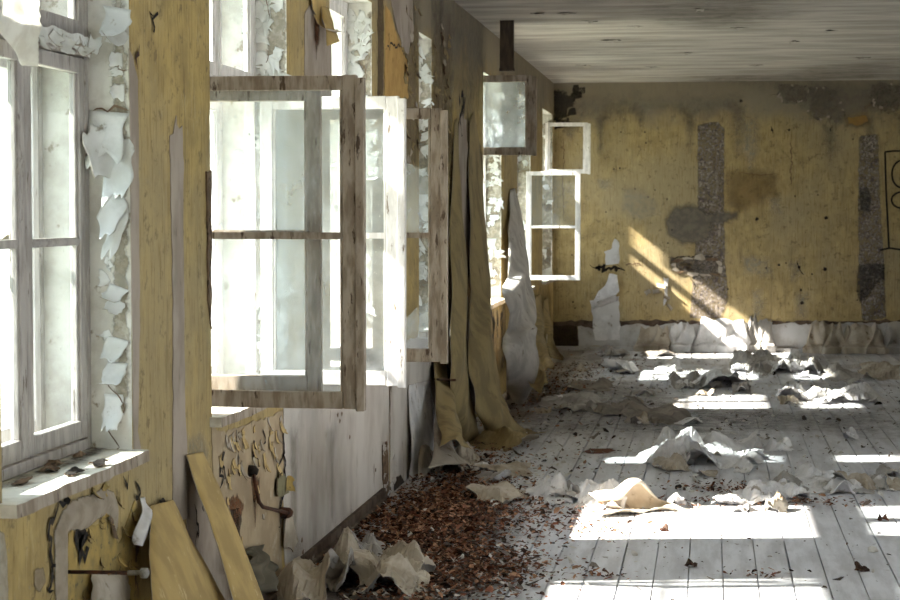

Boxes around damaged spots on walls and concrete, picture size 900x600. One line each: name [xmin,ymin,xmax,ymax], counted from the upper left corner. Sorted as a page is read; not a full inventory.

peeling [255,0,291,76]
peeling [304,5,374,96]
peeling [38,0,141,450]
peeling [273,109,289,230]
peeling [366,239,376,331]
peeling [366,120,382,228]
crack [589,261,643,273]
flaking render [578,122,728,347]
leakage [666,205,737,244]
flaking render [771,322,811,348]
flaking render [211,361,436,576]
peeling [68,482,142,600]